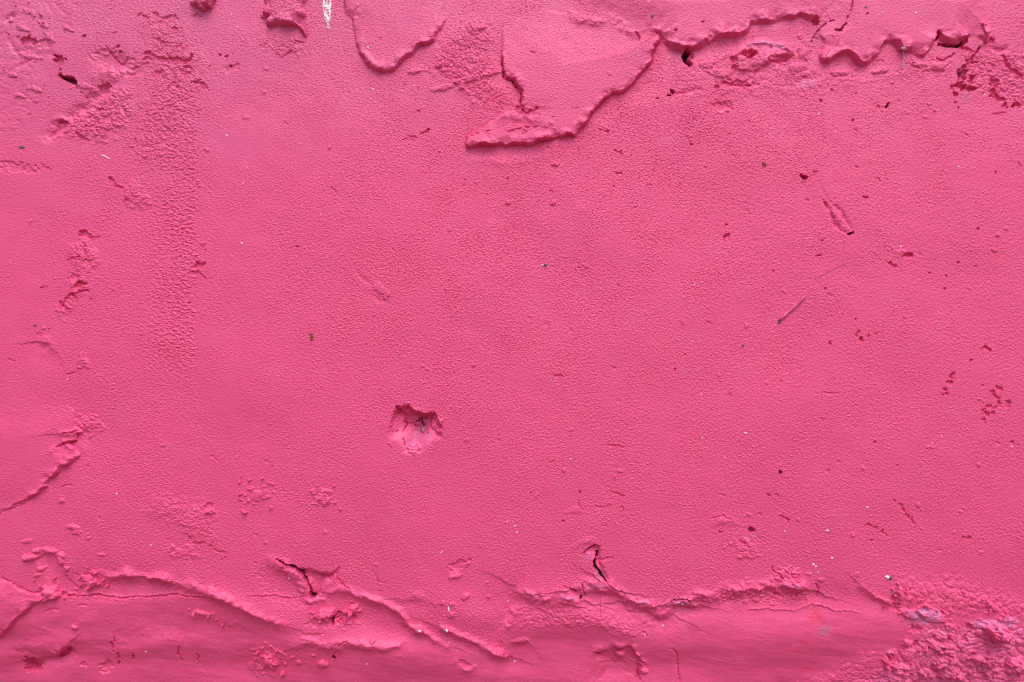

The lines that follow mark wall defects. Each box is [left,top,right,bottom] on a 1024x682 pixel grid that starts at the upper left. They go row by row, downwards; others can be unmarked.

peeling [339,0,661,152]
spalling [667,15,1024,115]
peeling [0,404,88,515]
spalling [511,602,651,682]
crack [563,536,614,601]
peeling [665,596,701,608]
spalling [864,575,1024,682]